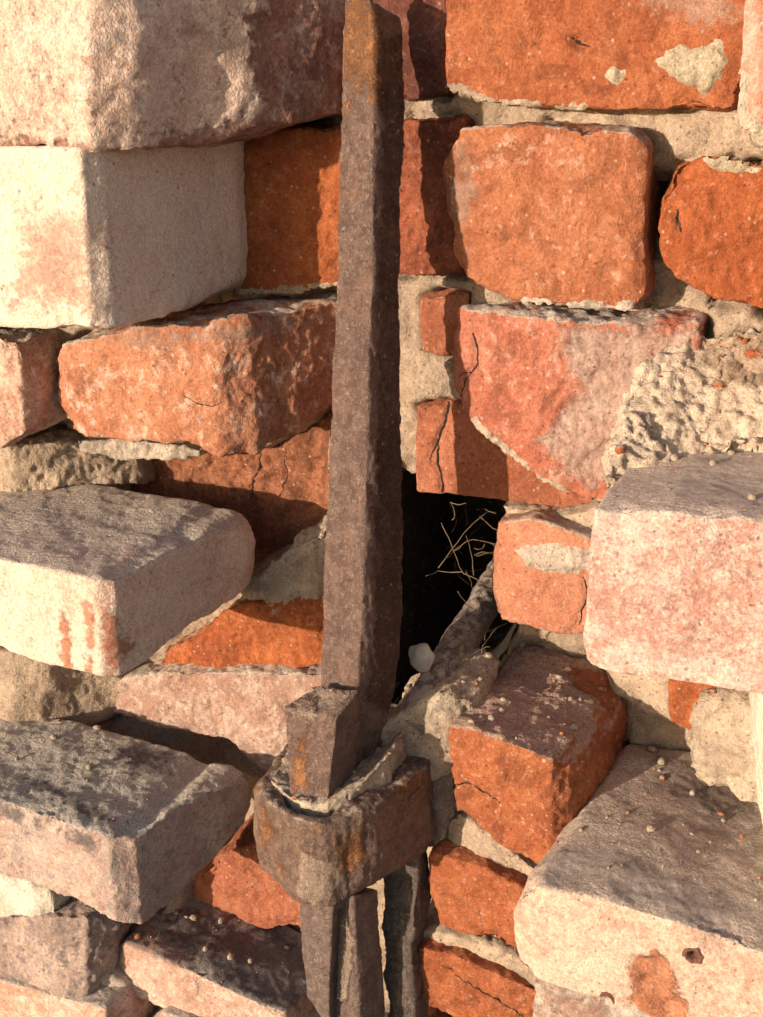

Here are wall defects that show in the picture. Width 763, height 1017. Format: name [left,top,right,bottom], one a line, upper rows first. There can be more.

corrosion [343,0,405,712]
crack [430,333,479,494]
crack [251,453,288,500]
crack [579,577,588,625]
corrosion [291,725,309,793]
corrosion [337,831,367,874]
crack [442,965,523,1017]